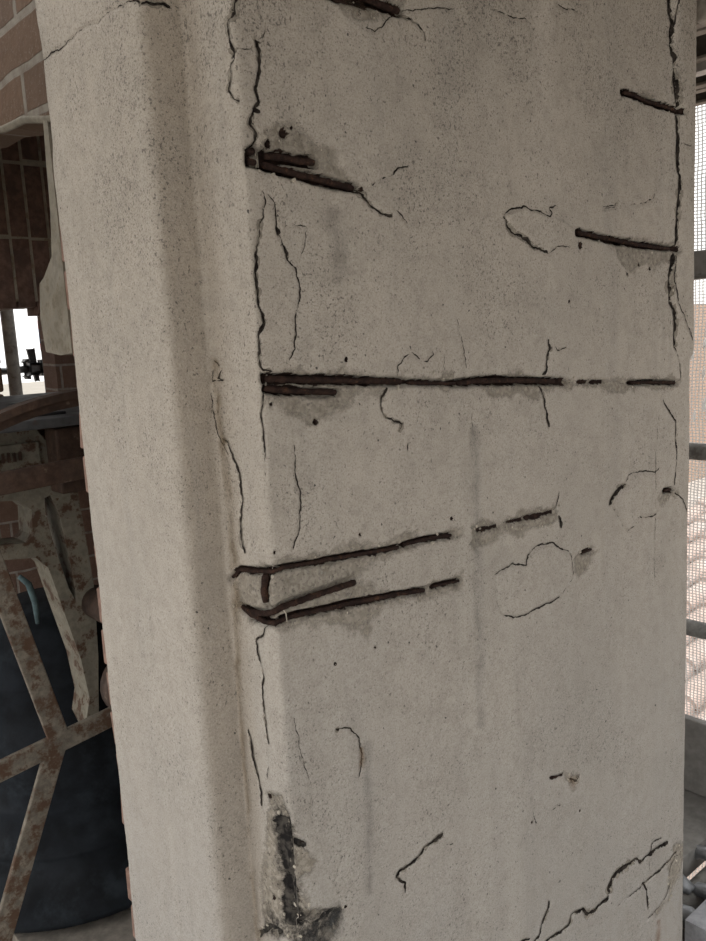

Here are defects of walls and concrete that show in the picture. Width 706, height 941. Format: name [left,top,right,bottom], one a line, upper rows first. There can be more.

crack [224,0,274,149]
crack [603,0,693,373]
crack [253,192,307,476]
crack [211,361,246,553]
crack [293,446,302,549]
crack [248,627,269,806]
crack [336,719,362,776]
spalling [260,791,347,941]
crack [396,832,453,893]
crack [521,838,677,941]